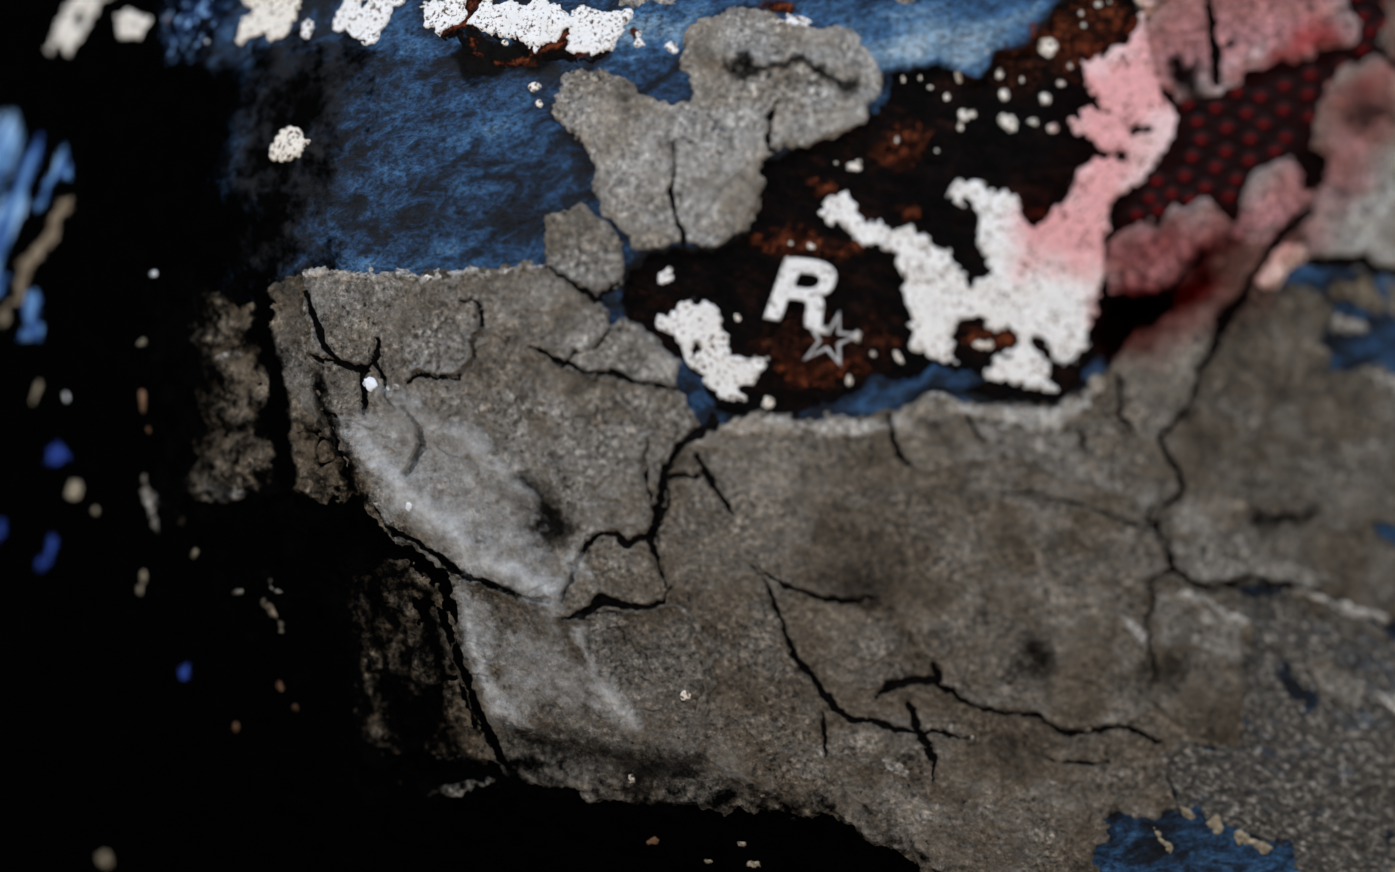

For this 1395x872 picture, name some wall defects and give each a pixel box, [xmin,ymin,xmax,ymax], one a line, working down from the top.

peeling [46,0,102,55]
peeling [116,0,314,57]
peeling [333,0,646,108]
peeling [269,126,310,162]
crack [303,290,485,477]
crack [528,266,678,391]
spalling [621,0,1178,440]
crack [886,412,913,467]
crack [1004,206,1395,668]
spalling [1255,242,1310,290]
crack [378,412,734,620]
crack [752,566,1162,783]